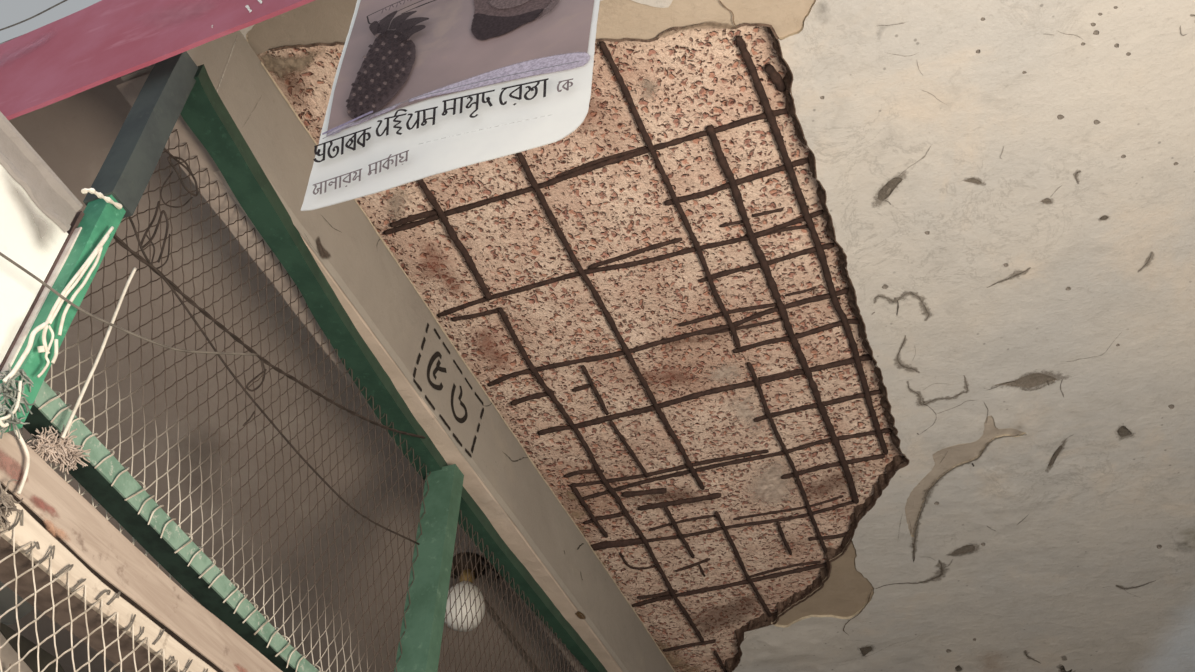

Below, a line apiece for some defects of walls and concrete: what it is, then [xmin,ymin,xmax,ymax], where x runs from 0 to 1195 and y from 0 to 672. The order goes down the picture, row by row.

spalling [245,0,357,145]
spalling [355,0,909,672]
peeling [905,415,1026,537]
flaking render [951,543,985,556]